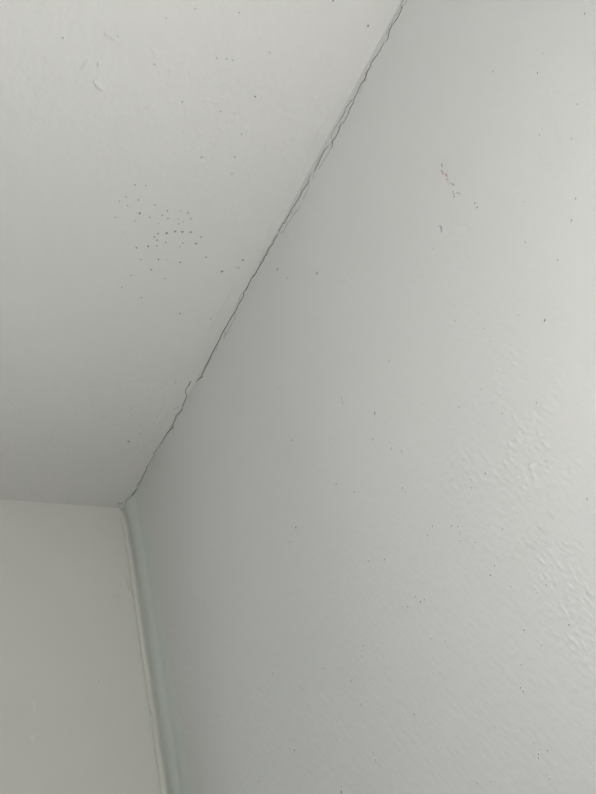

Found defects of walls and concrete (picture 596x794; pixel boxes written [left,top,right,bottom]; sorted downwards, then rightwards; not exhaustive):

crack [118,0,407,505]